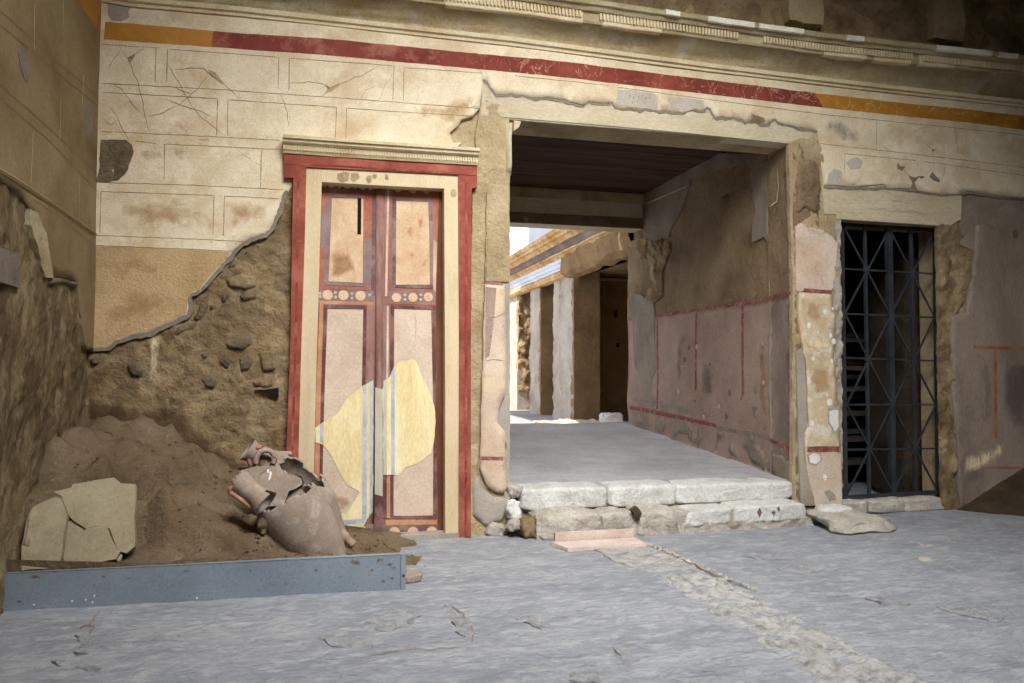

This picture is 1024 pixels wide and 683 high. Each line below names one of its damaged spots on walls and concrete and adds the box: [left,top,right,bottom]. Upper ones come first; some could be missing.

crack [107,46,263,177]
crack [281,67,392,124]
flaking render [616,90,704,112]
flaking render [97,139,134,182]
flaking render [629,234,672,303]
flaking render [0,182,293,617]